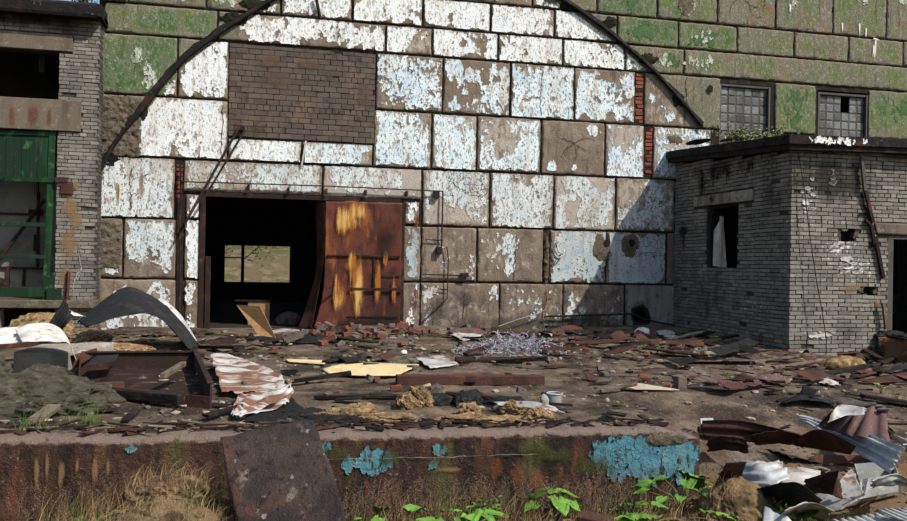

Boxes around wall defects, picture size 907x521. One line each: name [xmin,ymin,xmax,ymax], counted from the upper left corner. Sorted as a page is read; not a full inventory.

peeling [98,0,718,360]
corrosion [337,203,366,232]
corrosion [334,253,362,312]
corrosion [375,253,388,301]
peeling [588,432,699,487]